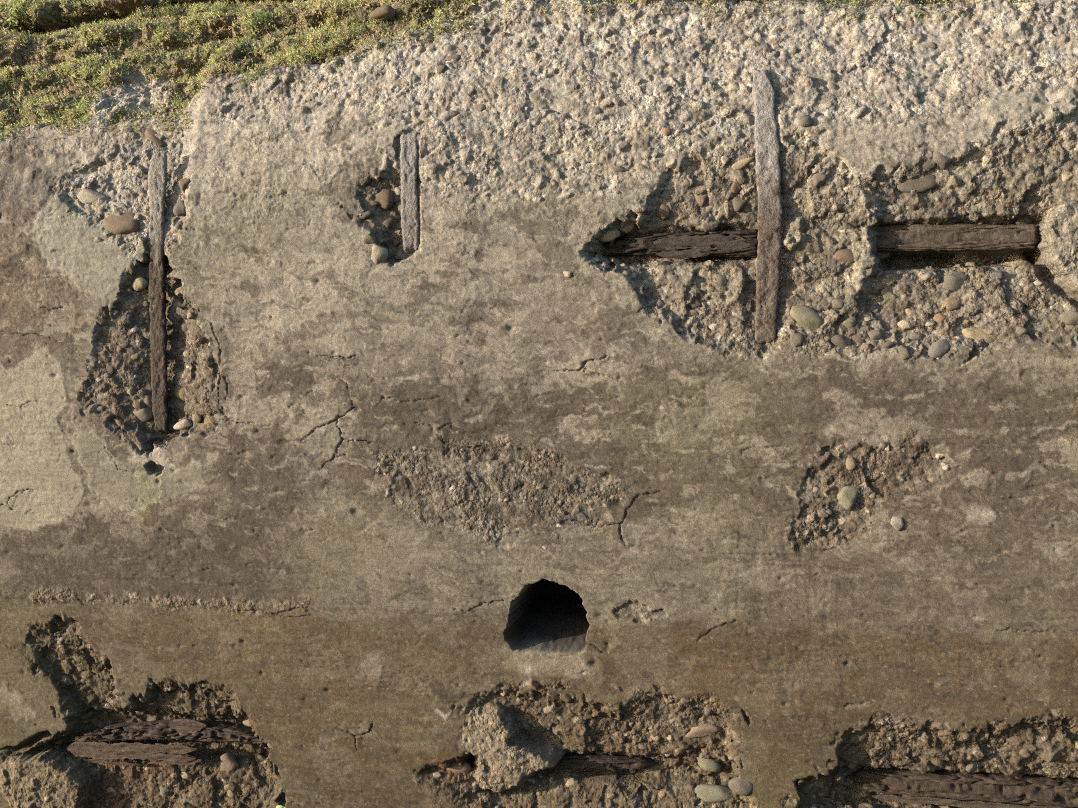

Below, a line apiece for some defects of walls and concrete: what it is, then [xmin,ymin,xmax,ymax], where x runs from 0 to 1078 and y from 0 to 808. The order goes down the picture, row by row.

spalling [337,127,432,271]
spalling [574,96,1078,375]
spalling [0,125,226,533]
crack [311,354,373,470]
crack [559,517,631,550]
spalling [0,676,290,808]
spalling [413,676,762,808]
spalling [779,707,1078,808]